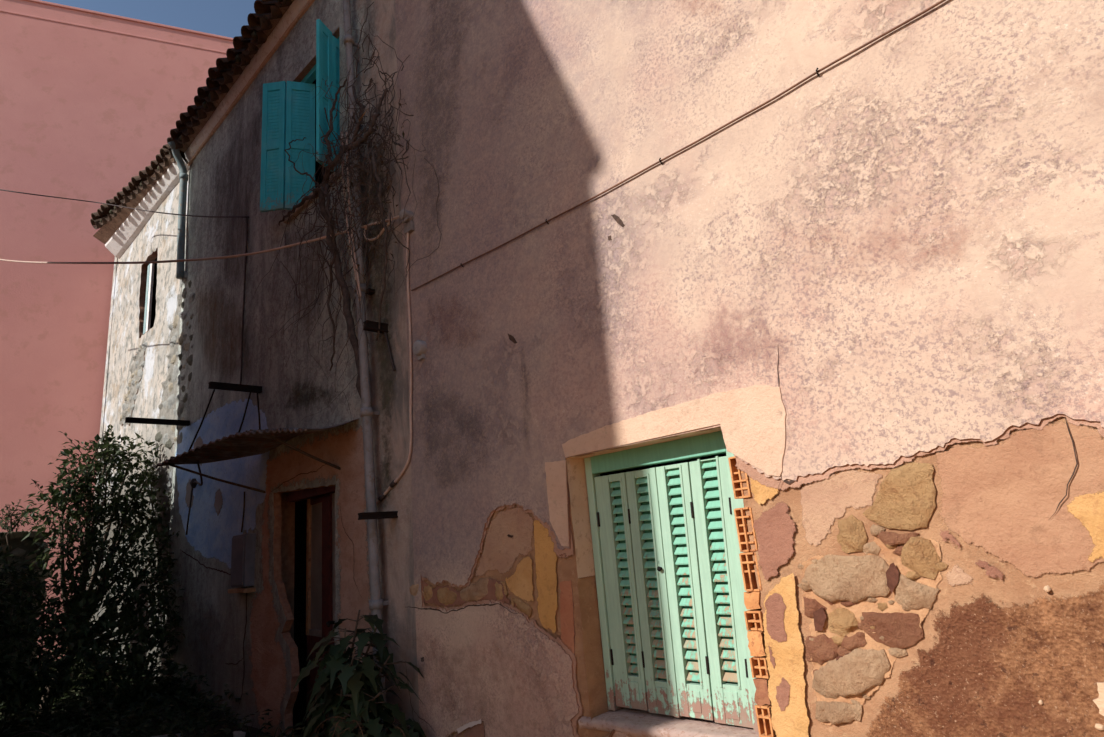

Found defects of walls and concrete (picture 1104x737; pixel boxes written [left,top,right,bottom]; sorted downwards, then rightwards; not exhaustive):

peeling [175,398,270,575]
spalling [410,507,576,655]
spalling [750,417,1104,737]
spalling [450,719,485,737]